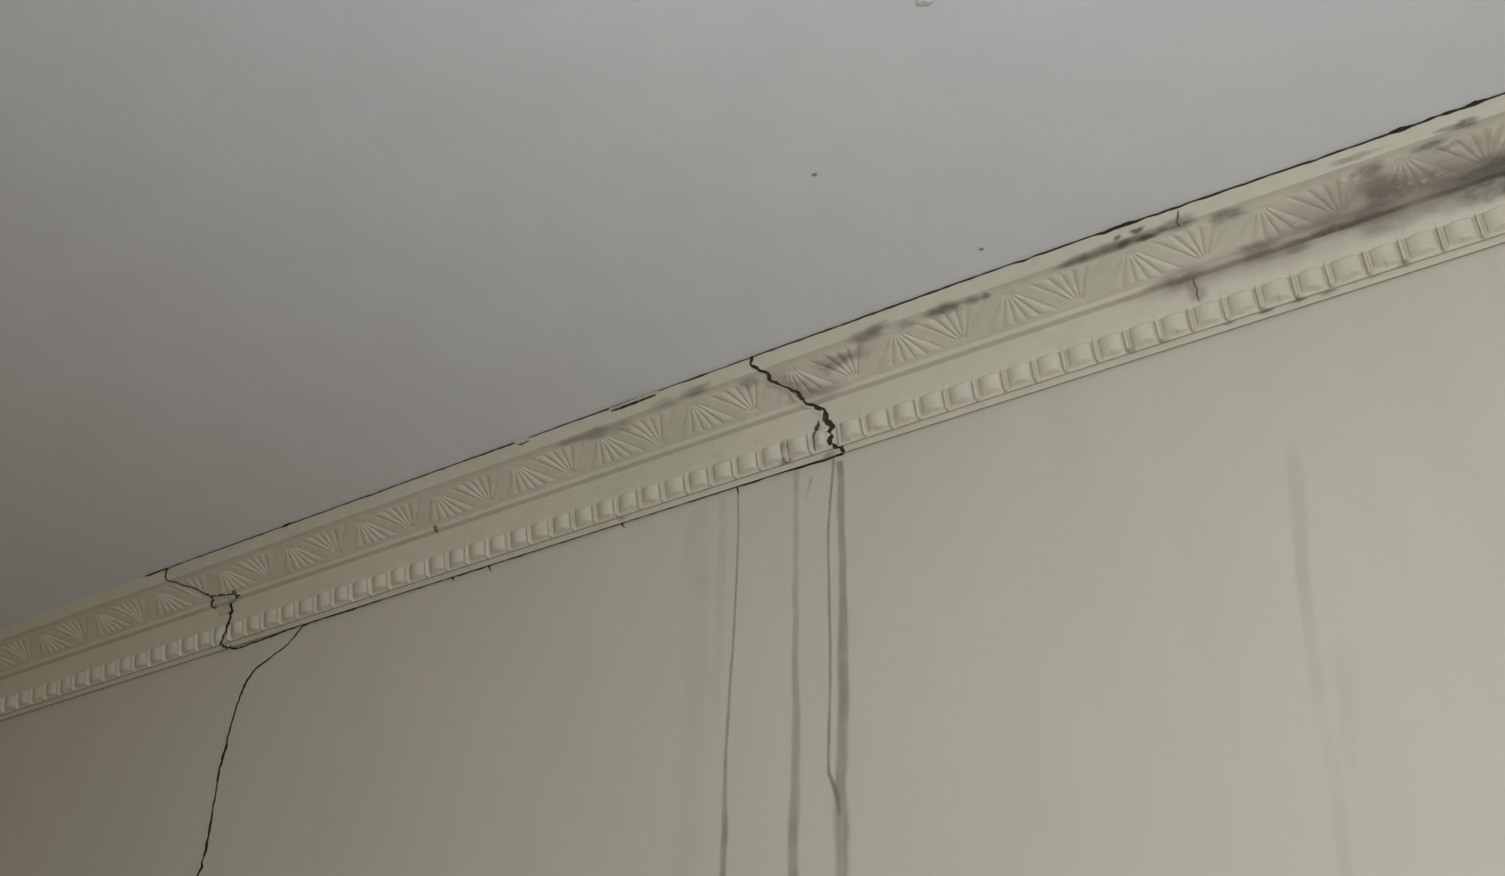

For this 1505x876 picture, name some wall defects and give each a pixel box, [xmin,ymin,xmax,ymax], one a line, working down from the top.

crack [195,92,1505,876]
water stain [1099,227,1152,253]